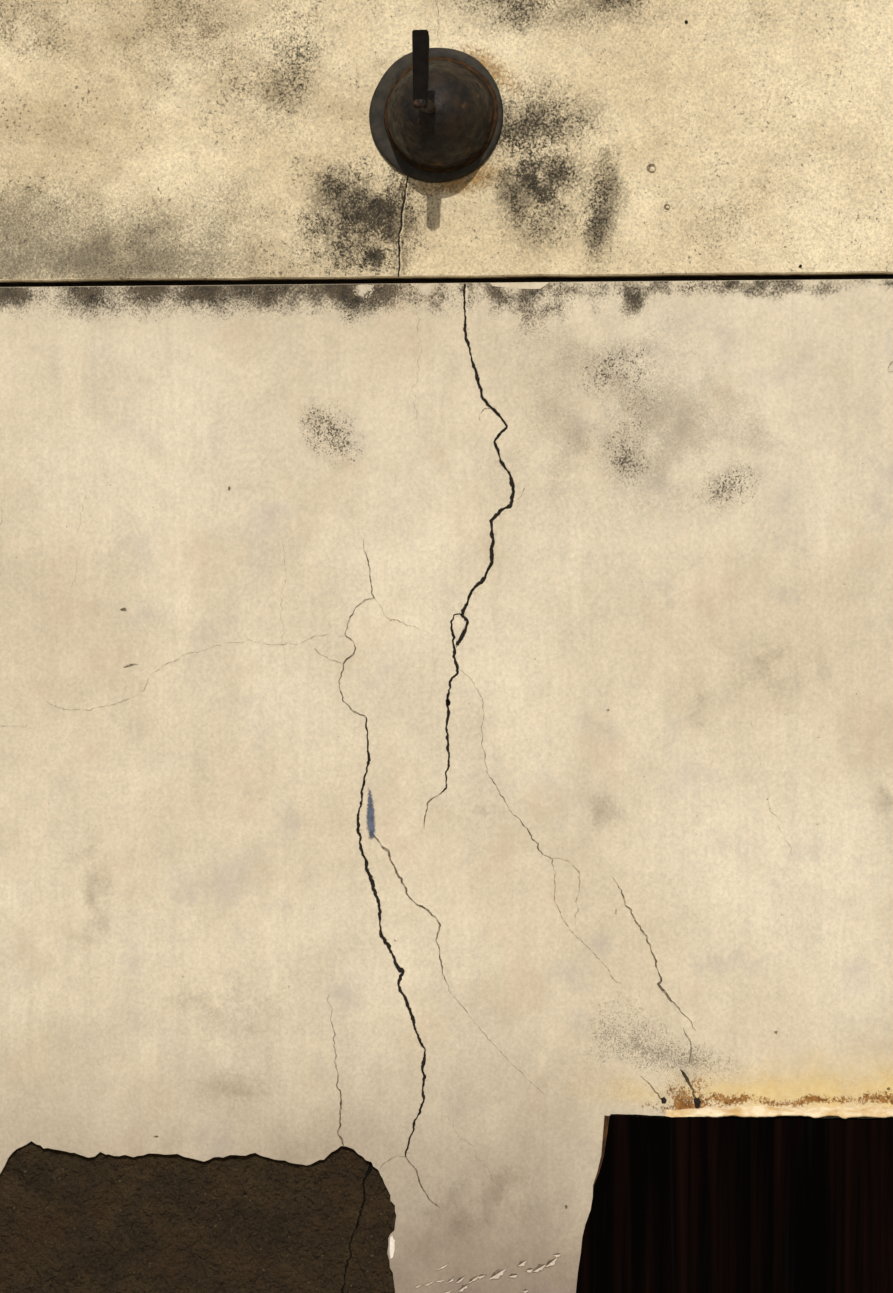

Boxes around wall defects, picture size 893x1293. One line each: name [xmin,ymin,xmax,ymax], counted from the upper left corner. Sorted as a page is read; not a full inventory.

water stain [473,0,649,29]
water stain [285,151,439,275]
crack [398,176,410,277]
water stain [479,77,617,261]
crack [424,283,620,983]
crack [315,539,544,1293]
crack [613,877,701,1109]
rust [642,1078,893,1112]
spalling [0,1141,396,1293]
spalling [415,1253,561,1293]